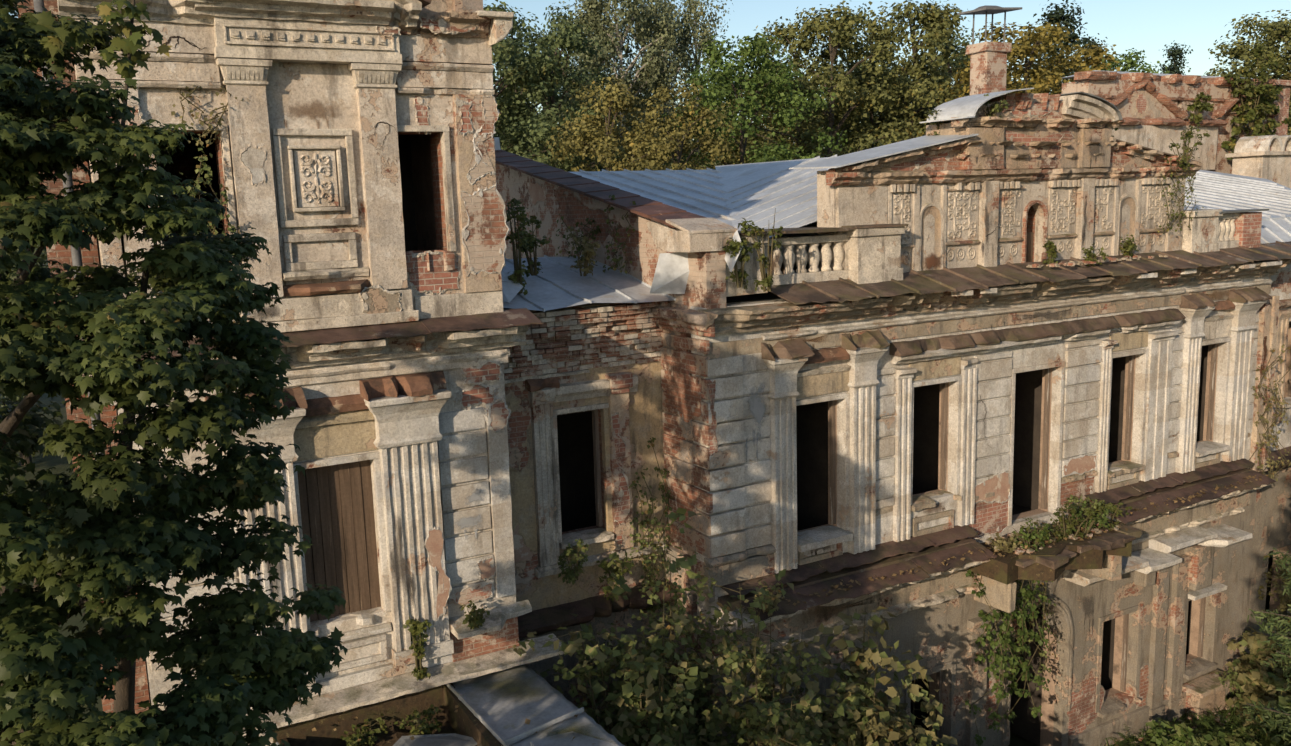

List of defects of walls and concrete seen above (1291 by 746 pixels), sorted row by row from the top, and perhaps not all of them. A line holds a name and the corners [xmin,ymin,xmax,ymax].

spalling [374,26,401,38]
spalling [418,15,476,35]
spalling [358,94,511,315]
peeling [458,359,531,474]
spalling [663,359,718,457]
spalling [968,470,1011,540]
spalling [1055,454,1098,518]
peeling [424,526,496,619]